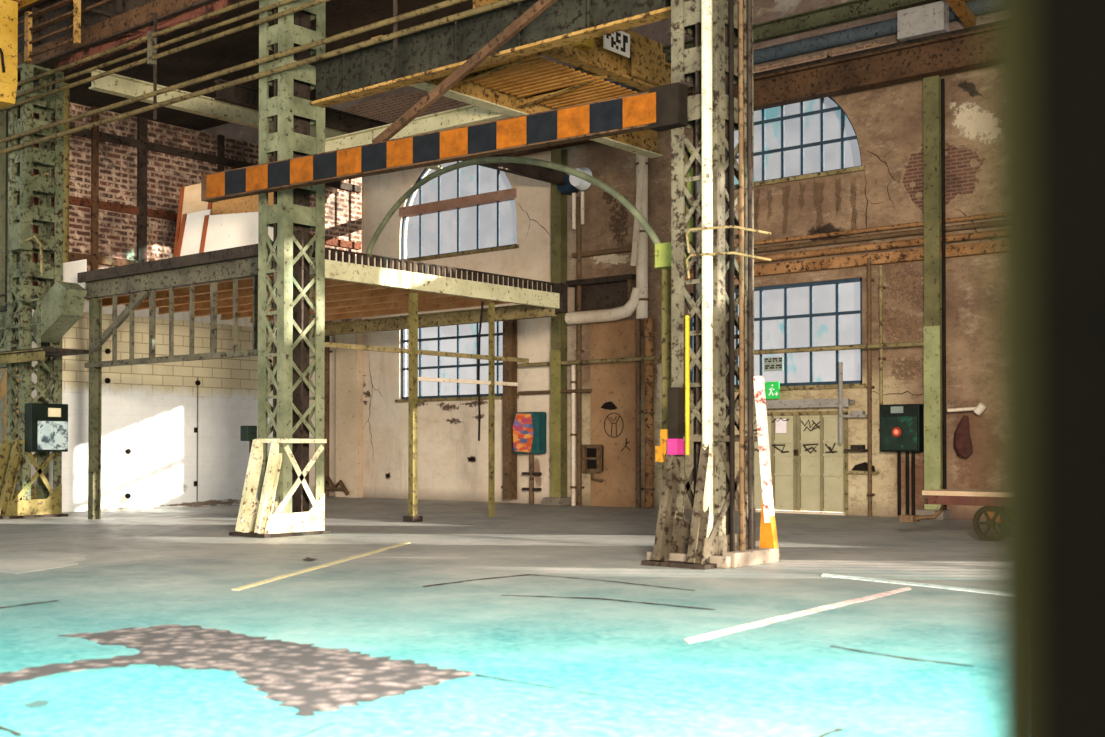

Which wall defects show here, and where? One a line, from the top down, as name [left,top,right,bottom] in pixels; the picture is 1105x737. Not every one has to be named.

spalling [900,144,924,217]
spalling [945,139,987,208]
water stain [809,223,850,241]